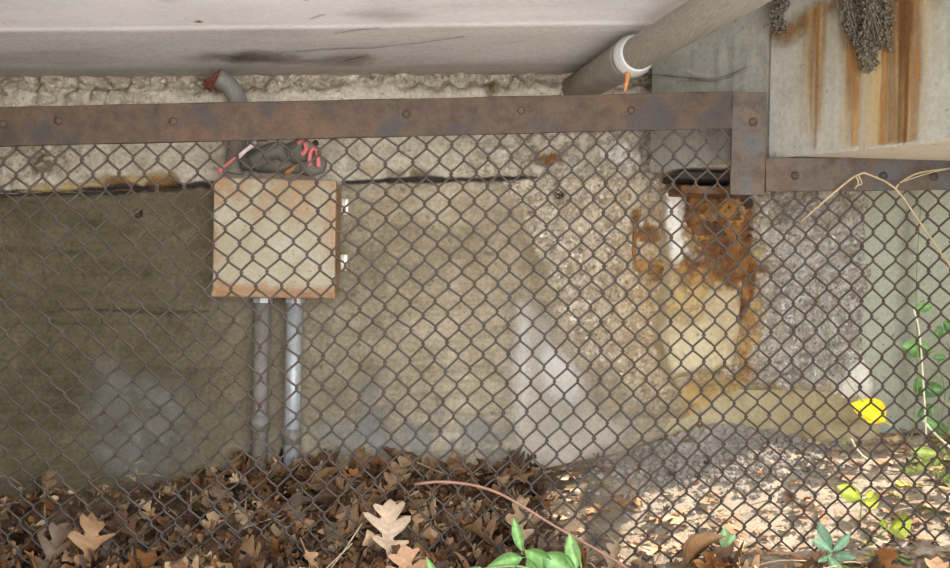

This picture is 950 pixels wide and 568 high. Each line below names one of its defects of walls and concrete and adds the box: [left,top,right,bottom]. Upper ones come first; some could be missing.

corrosion [808,4,825,147]
corrosion [846,0,929,146]
corrosion [631,185,769,380]